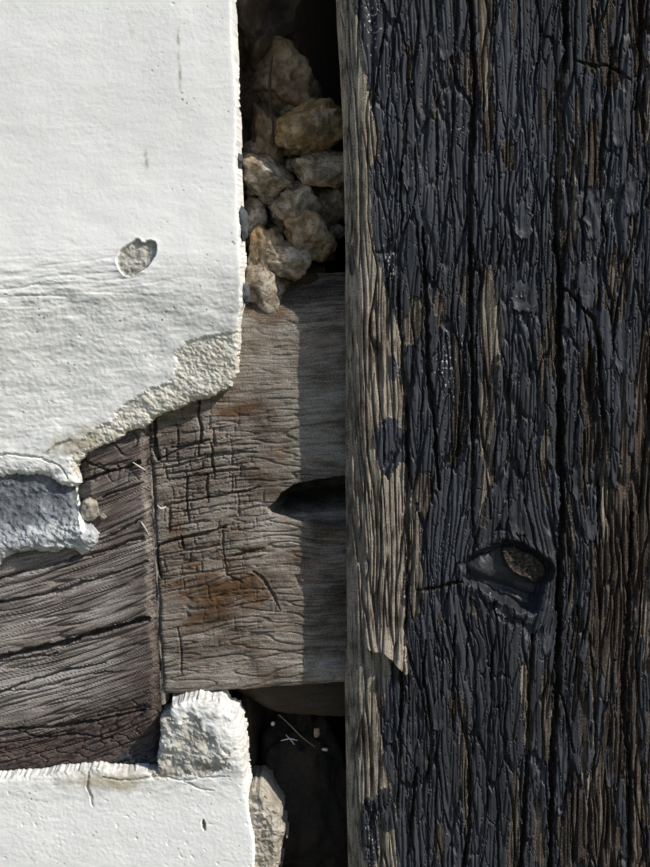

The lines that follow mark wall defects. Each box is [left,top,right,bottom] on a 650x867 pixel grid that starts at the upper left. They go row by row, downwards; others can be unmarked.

peeling [117,239,157,277]
spalling [0,331,242,565]
peeling [352,0,650,867]
crack [0,399,281,611]
crack [0,616,151,695]
crack [0,709,147,740]
spalling [147,702,231,781]